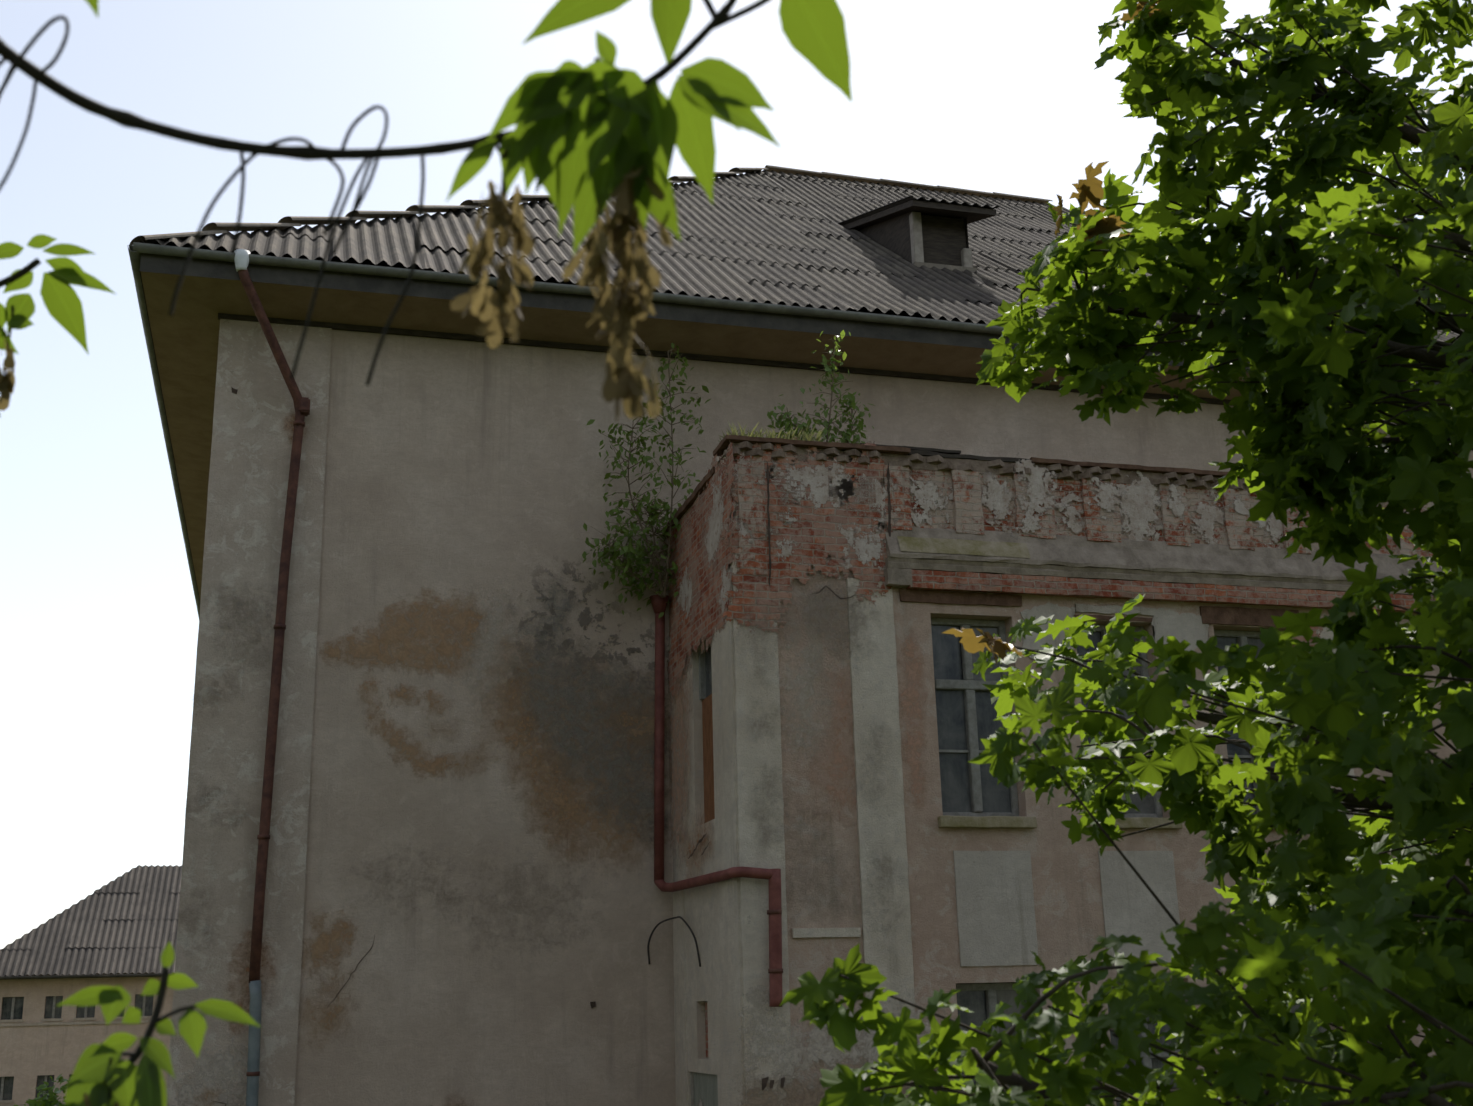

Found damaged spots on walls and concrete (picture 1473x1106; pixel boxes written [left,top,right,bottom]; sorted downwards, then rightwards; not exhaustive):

peeling [675,565,693,625]
flaking render [704,437,953,633]